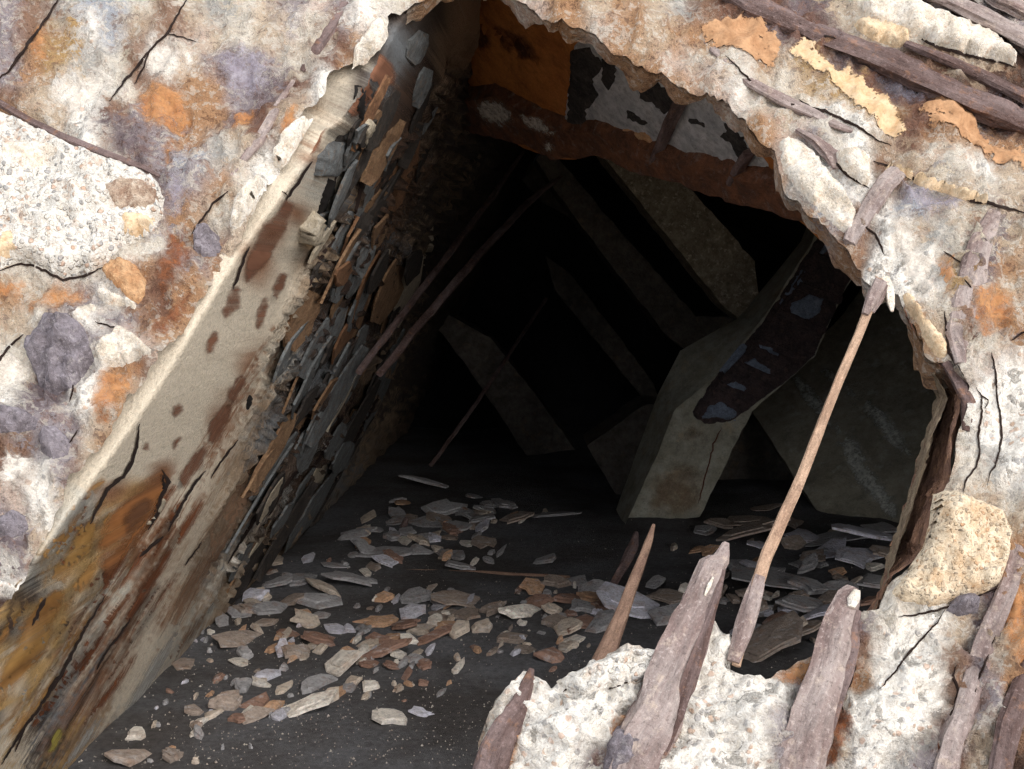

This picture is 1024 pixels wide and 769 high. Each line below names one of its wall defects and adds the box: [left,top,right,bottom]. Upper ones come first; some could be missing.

crack [109,0,196,101]
peeling [565,42,769,167]
peeling [700,14,907,137]
peeling [854,0,1017,65]
spalling [780,136,871,233]
crack [0,262,103,281]
rust [223,201,294,317]
rust [256,274,287,328]
crack [944,311,1024,491]
rust [0,373,261,737]
crack [879,606,949,689]
rust [104,726,184,767]